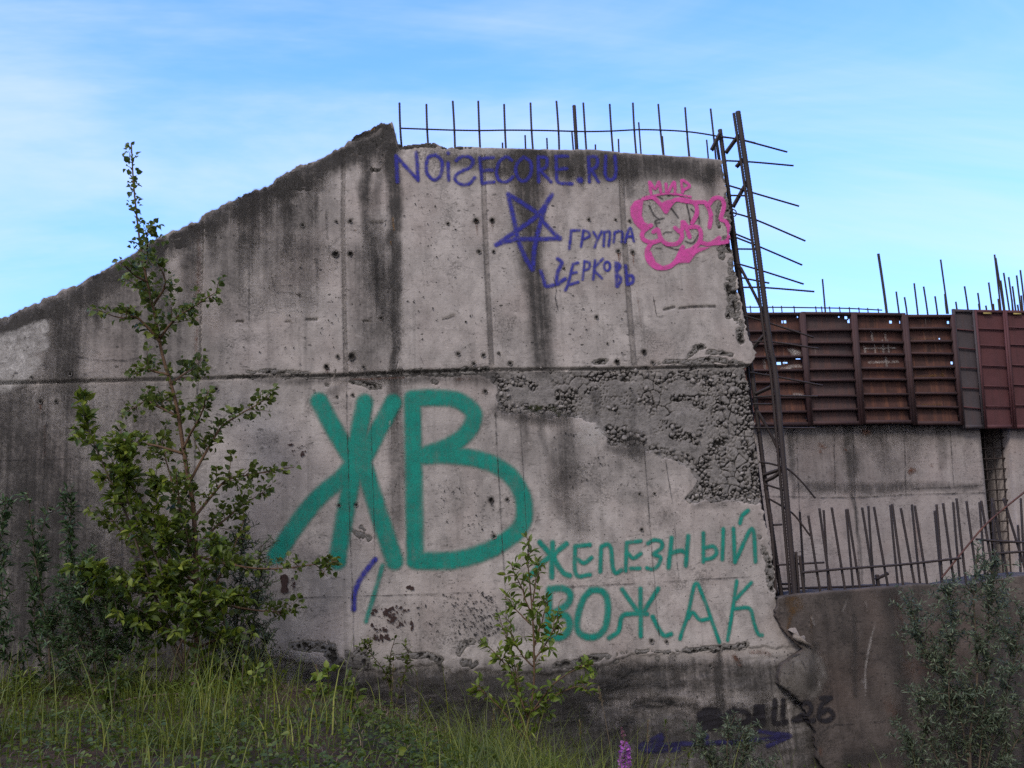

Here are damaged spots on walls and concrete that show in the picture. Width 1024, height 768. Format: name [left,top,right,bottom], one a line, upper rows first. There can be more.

water stain [443,149,721,370]
water stain [0,125,494,690]
water stain [256,653,822,768]